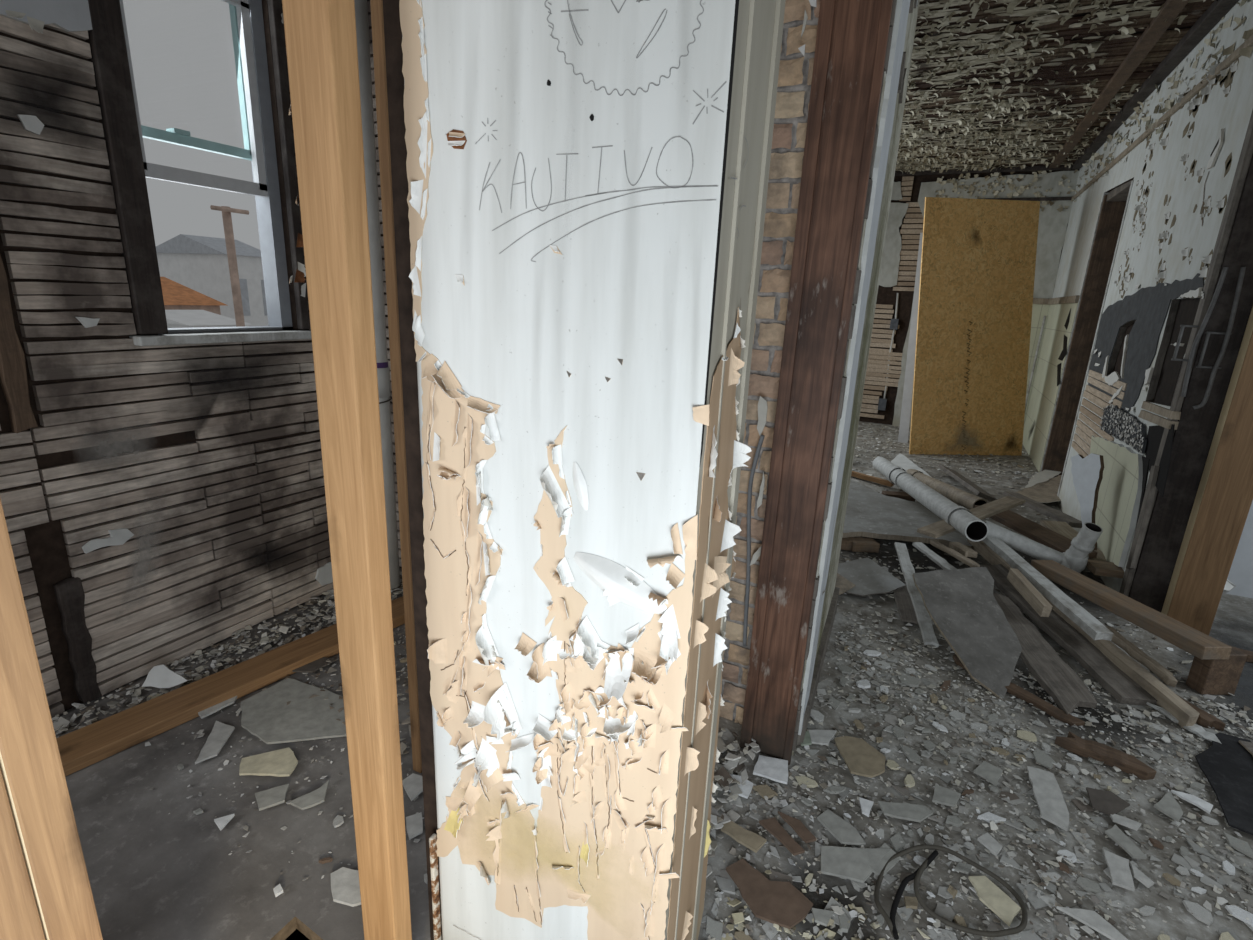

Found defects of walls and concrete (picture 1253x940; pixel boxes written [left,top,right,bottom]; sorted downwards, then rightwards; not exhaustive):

peeling [798,0,817,57]
peeling [895,0,1253,299]
spalling [1142,194,1213,406]
spalling [1092,322,1135,412]
peeling [399,0,813,940]
flaking render [809,730,886,778]
flaking render [821,846,891,883]